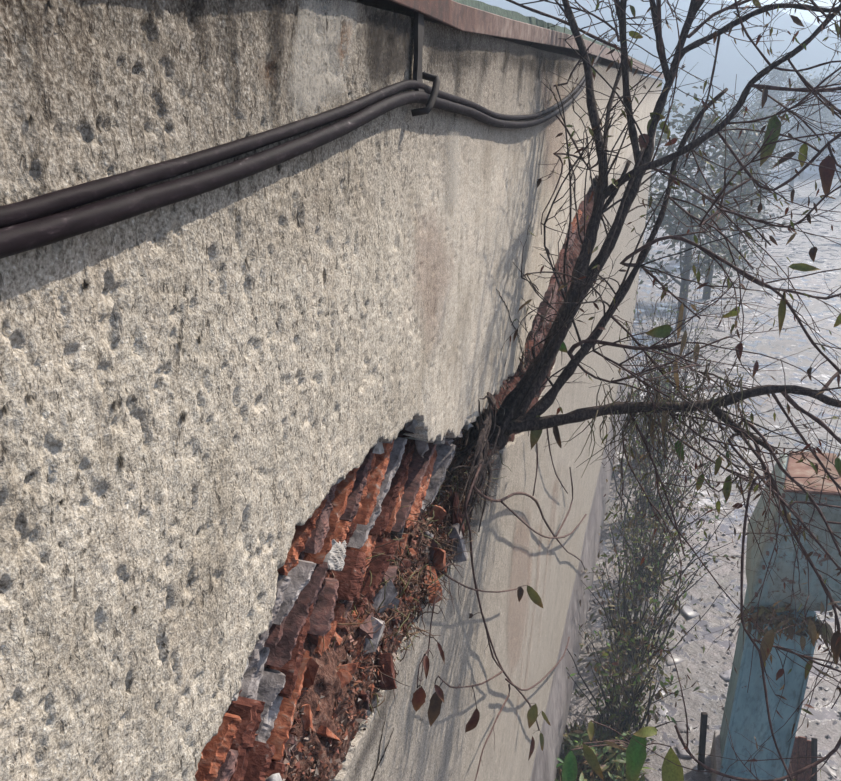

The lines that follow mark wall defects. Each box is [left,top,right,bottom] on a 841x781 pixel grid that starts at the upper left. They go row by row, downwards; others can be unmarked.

leakage [228,0,239,140]
leakage [268,0,286,127]
leakage [293,0,354,108]
leakage [368,10,412,81]
spalling [195,419,473,781]
crack [372,716,394,781]